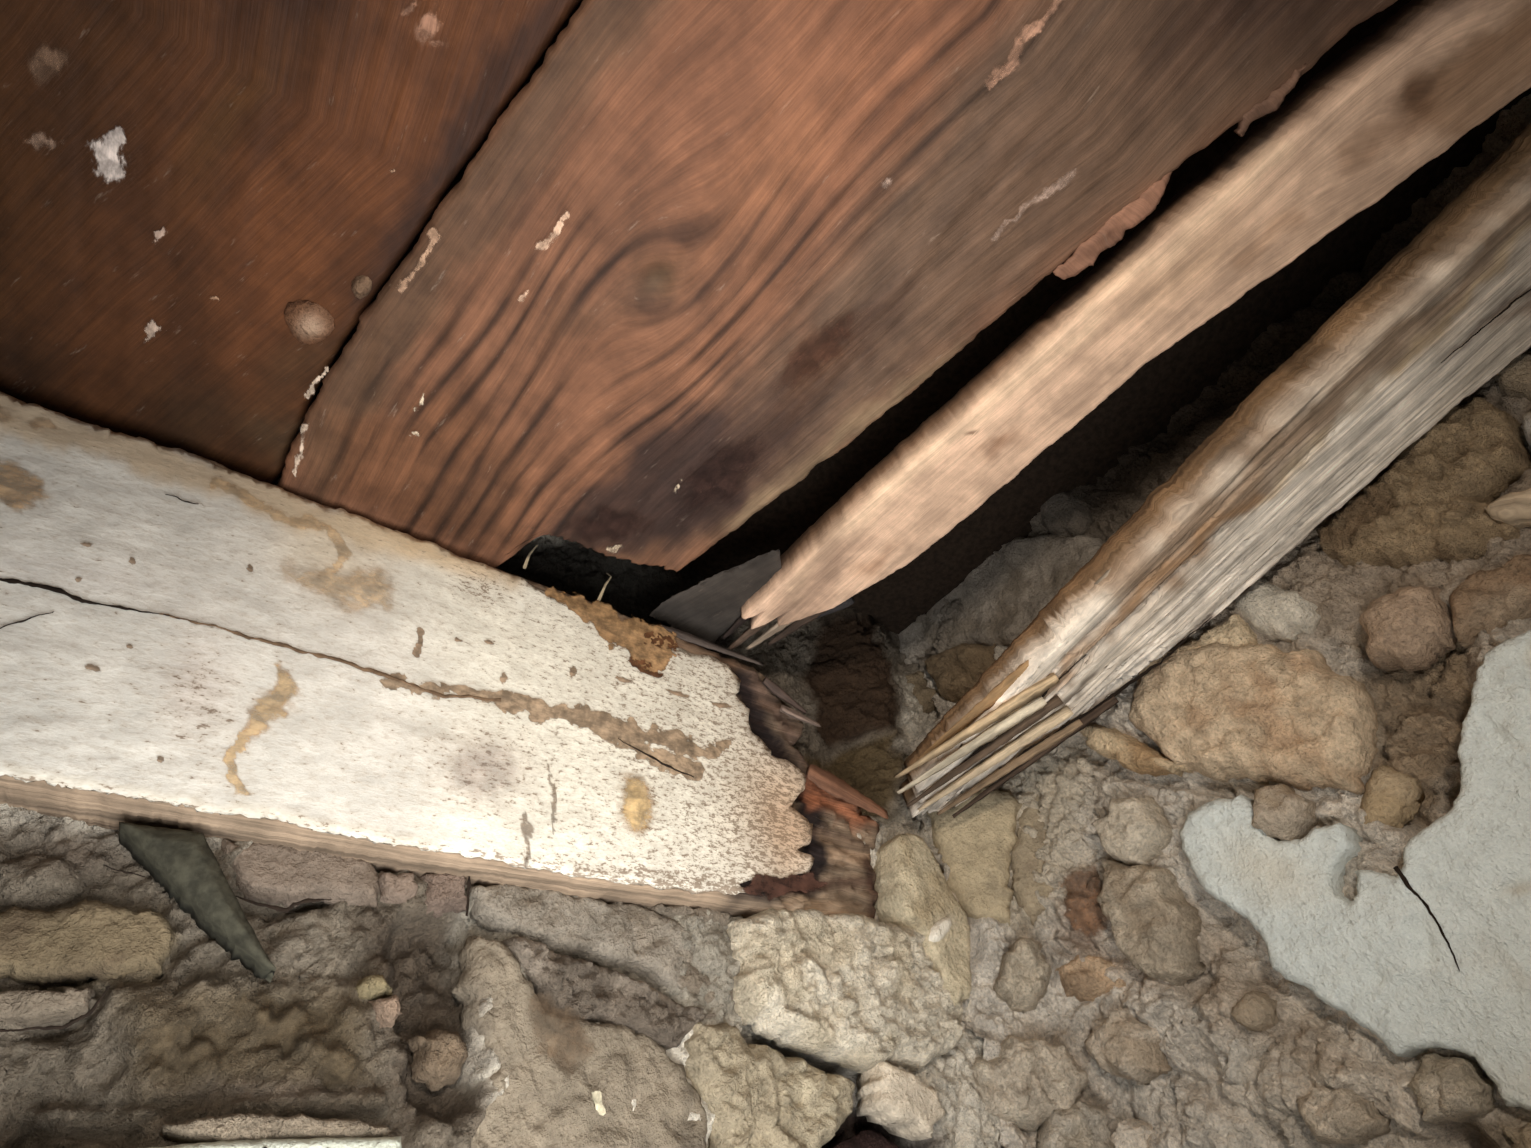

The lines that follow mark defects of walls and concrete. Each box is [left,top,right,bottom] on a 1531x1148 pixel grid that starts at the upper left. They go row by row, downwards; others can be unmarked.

crack [0,578,732,781]
crack [1393,866,1460,971]